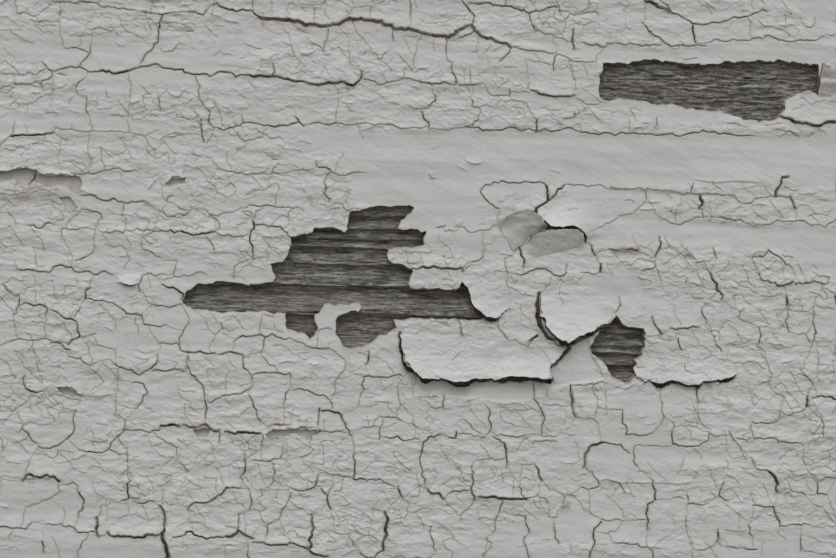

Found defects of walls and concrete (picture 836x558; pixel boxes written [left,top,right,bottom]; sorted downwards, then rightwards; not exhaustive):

crack [0,0,822,141]
peeling [599,59,836,122]
crack [776,102,836,136]
peeling [0,167,82,211]
crack [30,168,294,272]
crack [218,164,361,201]
crack [459,177,836,291]
peeling [182,196,736,389]
crack [757,250,836,347]
crack [0,257,807,558]